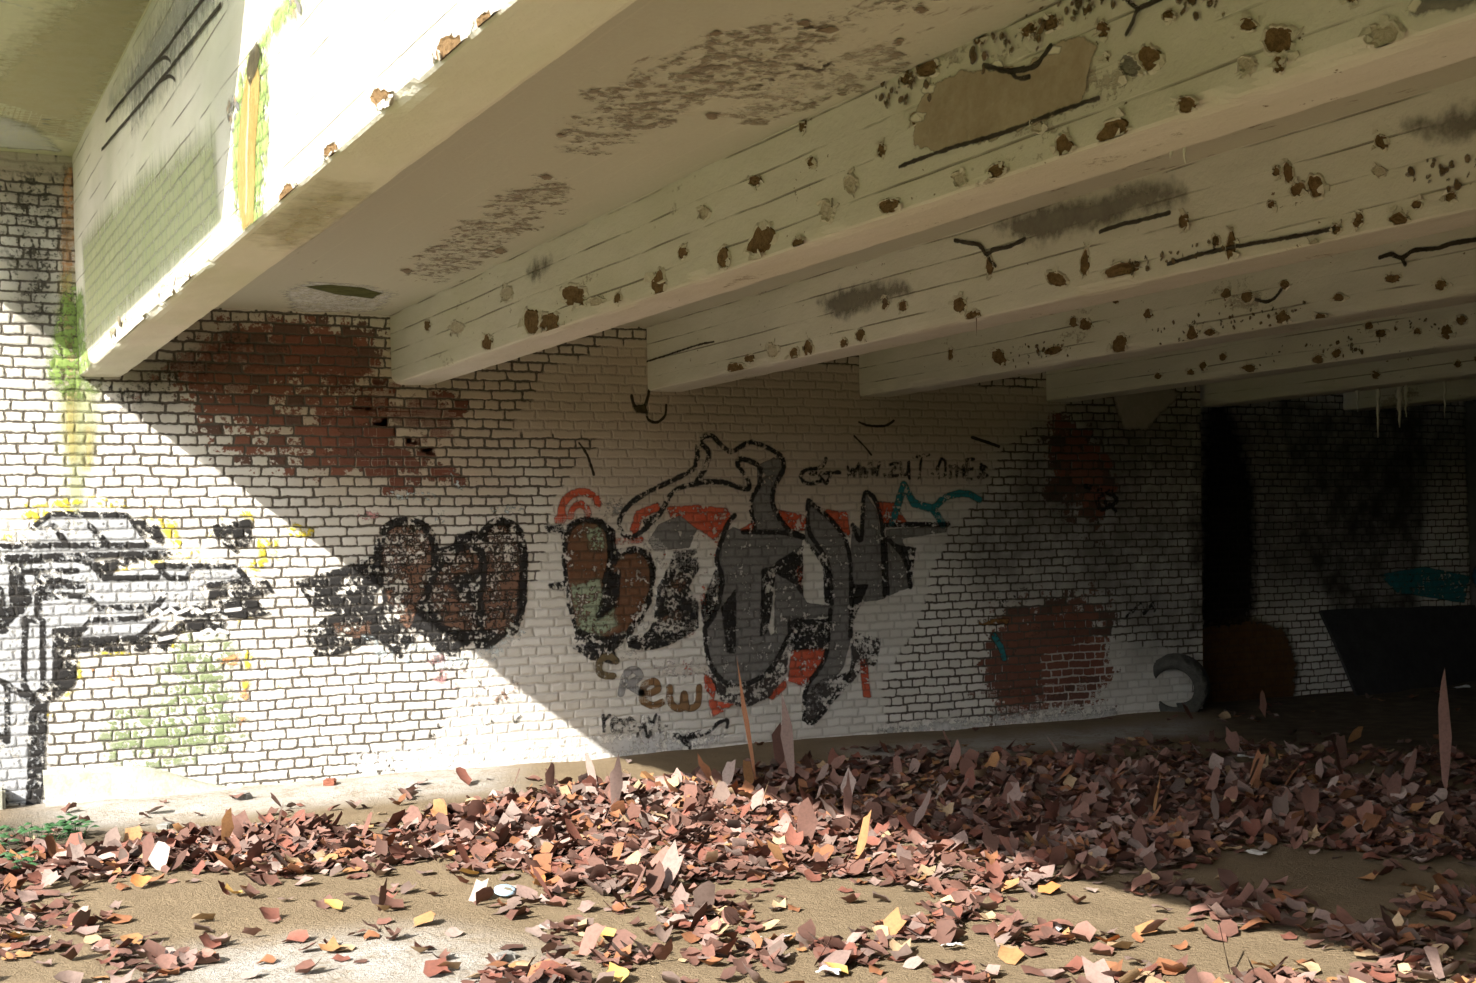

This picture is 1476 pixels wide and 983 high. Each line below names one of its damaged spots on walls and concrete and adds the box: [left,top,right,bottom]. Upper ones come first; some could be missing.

crack [101,0,221,151]
peeling [556,0,1166,160]
crack [982,43,1052,81]
crack [898,95,1100,168]
leakage [1001,186,1179,239]
spalling [643,242,689,295]
spalling [716,220,806,270]
crack [1167,227,1336,266]
crack [1378,238,1476,267]
leakage [0,150,250,499]
spalling [499,282,623,336]
peeling [319,378,468,499]